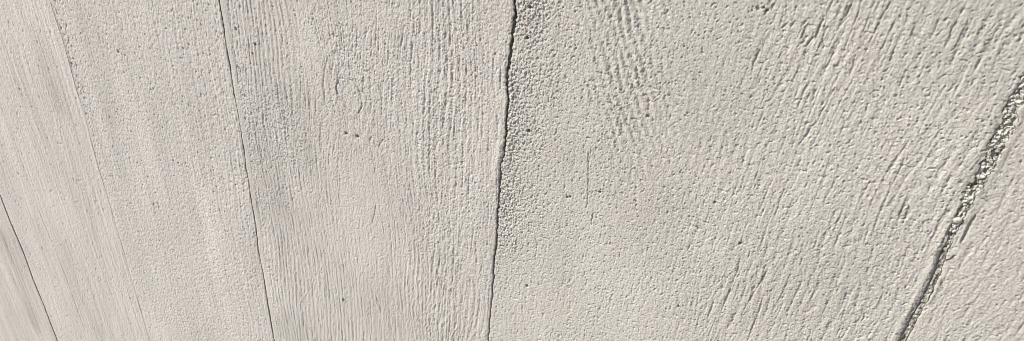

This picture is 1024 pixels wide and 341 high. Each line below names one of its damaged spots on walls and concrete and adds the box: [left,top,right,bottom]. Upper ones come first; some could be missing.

crack [488,0,517,341]